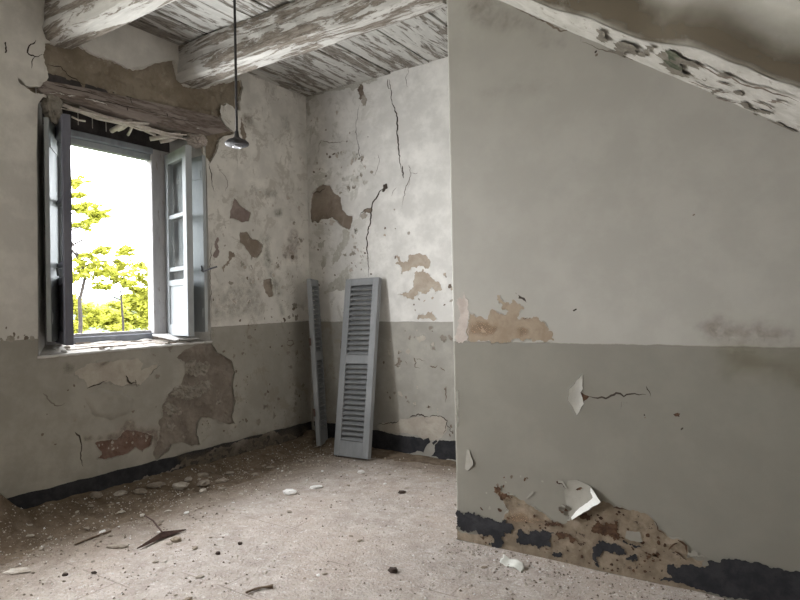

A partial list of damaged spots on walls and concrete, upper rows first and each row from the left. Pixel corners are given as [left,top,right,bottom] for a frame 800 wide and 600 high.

flaking render [16,44,248,164]
peeling [594,29,699,78]
peeling [733,90,794,132]
flaking render [212,132,373,322]
crack [318,68,417,275]
peeling [383,253,554,371]
peeling [58,354,160,395]
flaking render [94,319,305,461]
peeling [377,391,453,440]
crack [568,375,651,414]
peeling [456,475,708,594]